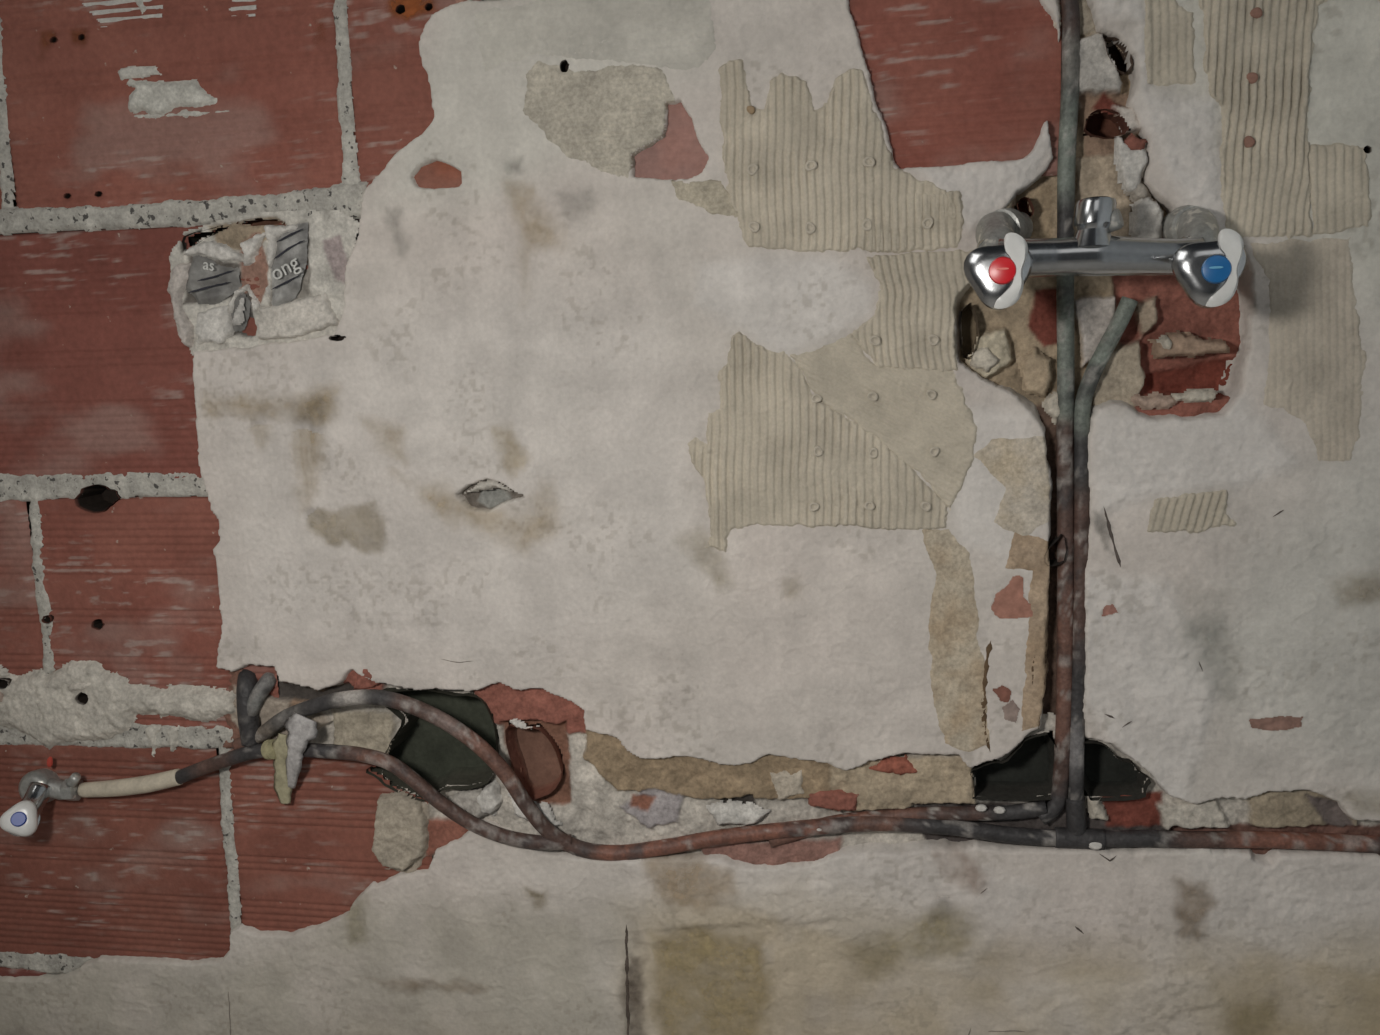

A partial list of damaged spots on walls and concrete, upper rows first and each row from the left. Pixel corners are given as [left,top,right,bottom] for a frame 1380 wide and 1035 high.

spalling [849,0,1062,176]
spalling [634,102,709,180]
spalling [0,0,481,698]
spalling [75,692,88,705]
spalling [807,789,859,812]
spalling [869,754,917,775]
spalling [0,714,432,977]